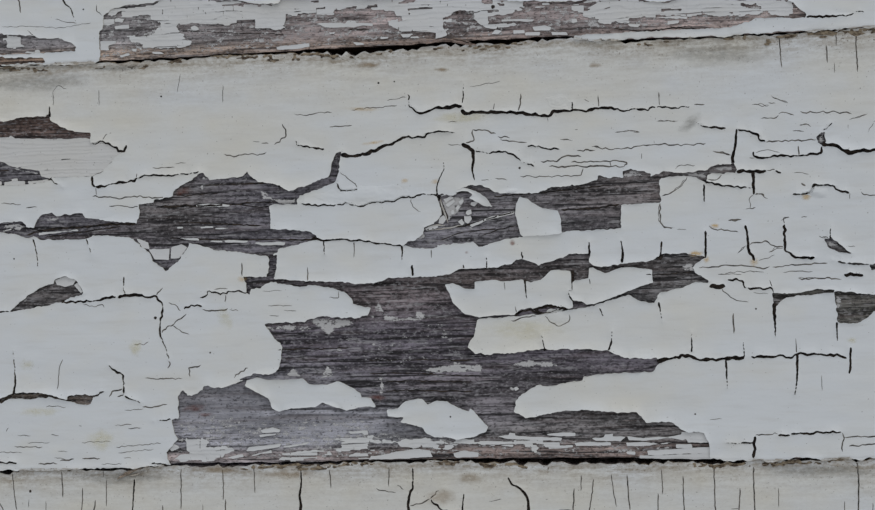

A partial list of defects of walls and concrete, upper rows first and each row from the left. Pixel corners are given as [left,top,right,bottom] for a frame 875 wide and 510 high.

peeling [0,34,76,65]
peeling [99,0,806,61]
peeling [0,115,122,186]
crack [28,81,875,393]
peeling [0,152,736,464]
peeling [772,289,875,323]
crack [0,365,182,510]
crack [296,470,304,510]
crack [376,468,464,510]
crack [489,477,530,510]
crack [562,474,630,510]
crack [713,430,875,510]